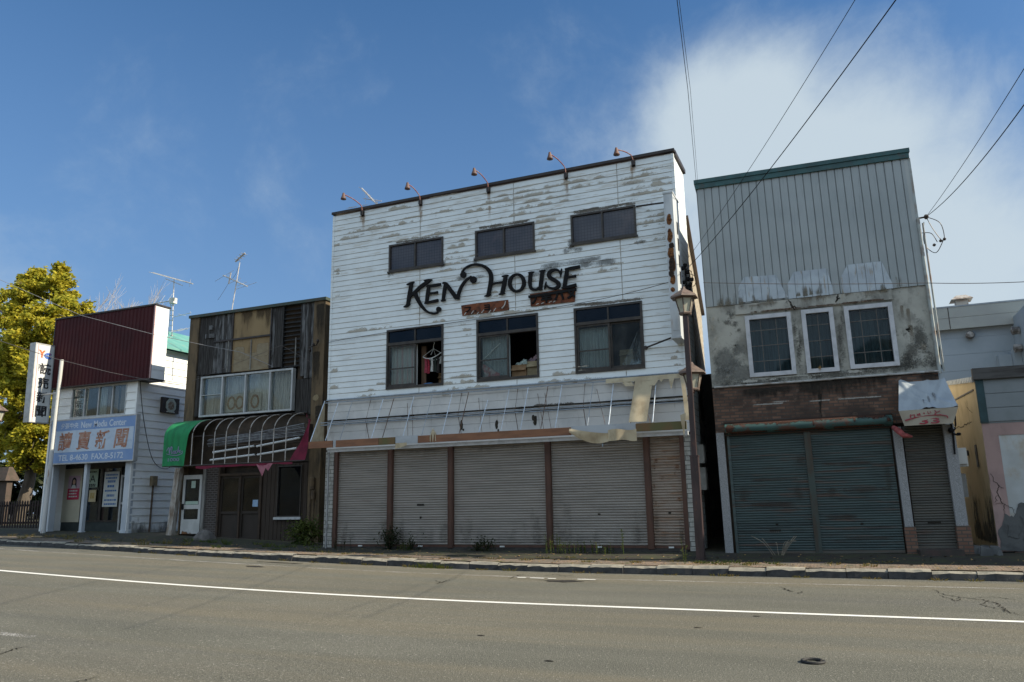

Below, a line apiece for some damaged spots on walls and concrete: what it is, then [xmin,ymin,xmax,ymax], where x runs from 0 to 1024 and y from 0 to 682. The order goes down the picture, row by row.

peeling [334,167,671,284]
peeling [461,307,556,331]
peeling [432,374,488,396]
water stain [715,345,887,404]
rust [725,415,891,434]
spalling [998,502,1024,551]